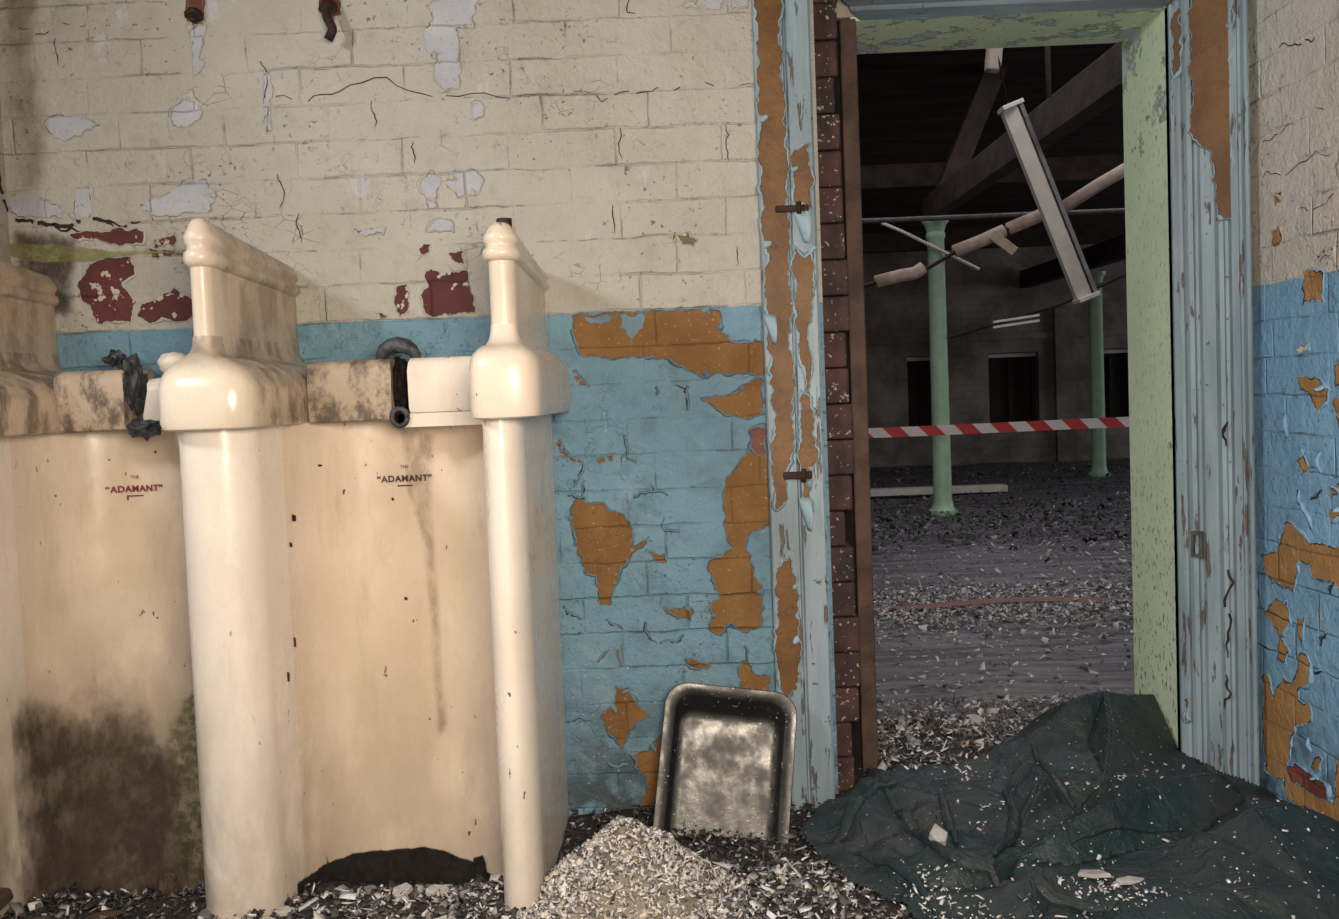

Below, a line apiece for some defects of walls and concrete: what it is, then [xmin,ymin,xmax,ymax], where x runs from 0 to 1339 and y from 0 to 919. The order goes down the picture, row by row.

crack [18,23,83,66]
peeling [422,0,479,95]
peeling [1170,0,1237,223]
crack [0,174,140,232]
peeling [6,178,216,325]
peeling [375,168,485,320]
peeling [1301,267,1325,306]
peeling [567,0,822,697]
peeling [1297,358,1339,429]
peeling [1328,482,1339,524]
peeling [1261,520,1339,821]
peeling [600,685,662,808]